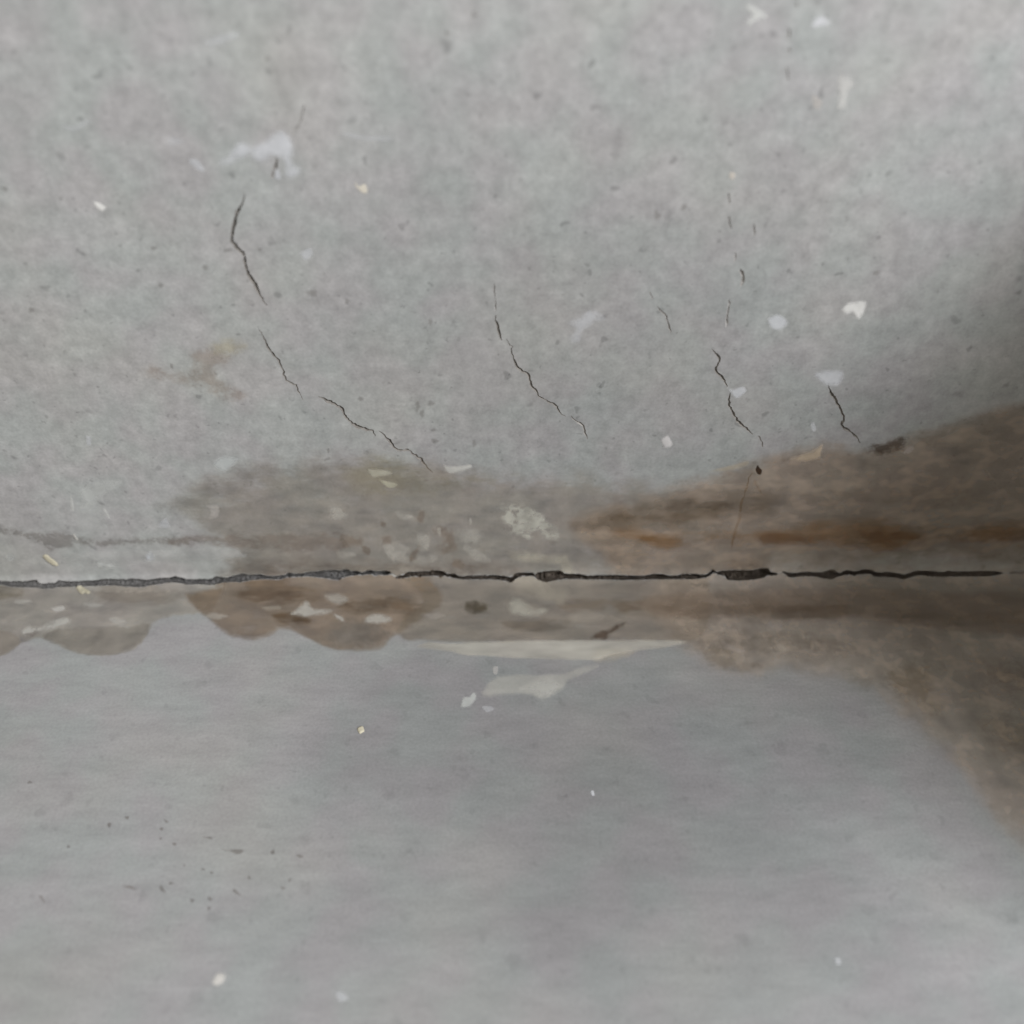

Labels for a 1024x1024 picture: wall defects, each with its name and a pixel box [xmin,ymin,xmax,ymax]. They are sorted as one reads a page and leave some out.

crack [270,157,278,178]
crack [230,192,433,473]
crack [493,284,588,440]
crack [712,349,763,447]
crack [828,384,883,455]
water stain [578,412,1024,575]
crack [0,568,1024,589]